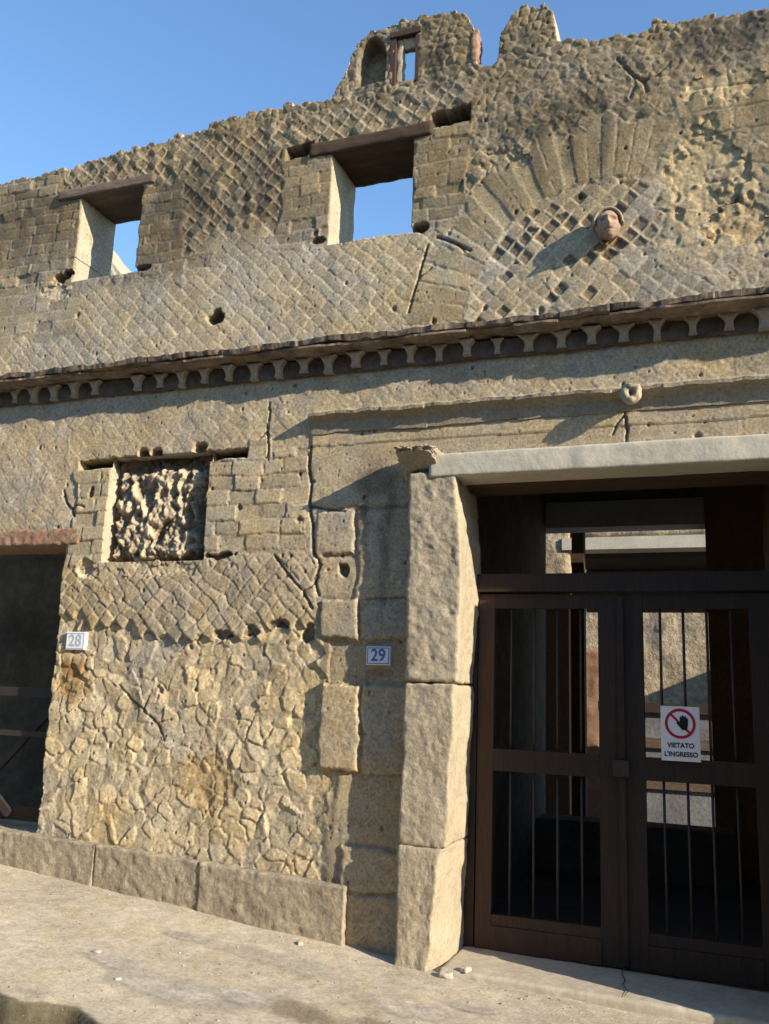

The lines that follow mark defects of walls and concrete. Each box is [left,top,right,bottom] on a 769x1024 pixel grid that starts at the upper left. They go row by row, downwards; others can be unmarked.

crack [409,236,469,311]
crack [613,411,628,442]
crack [119,685,168,740]